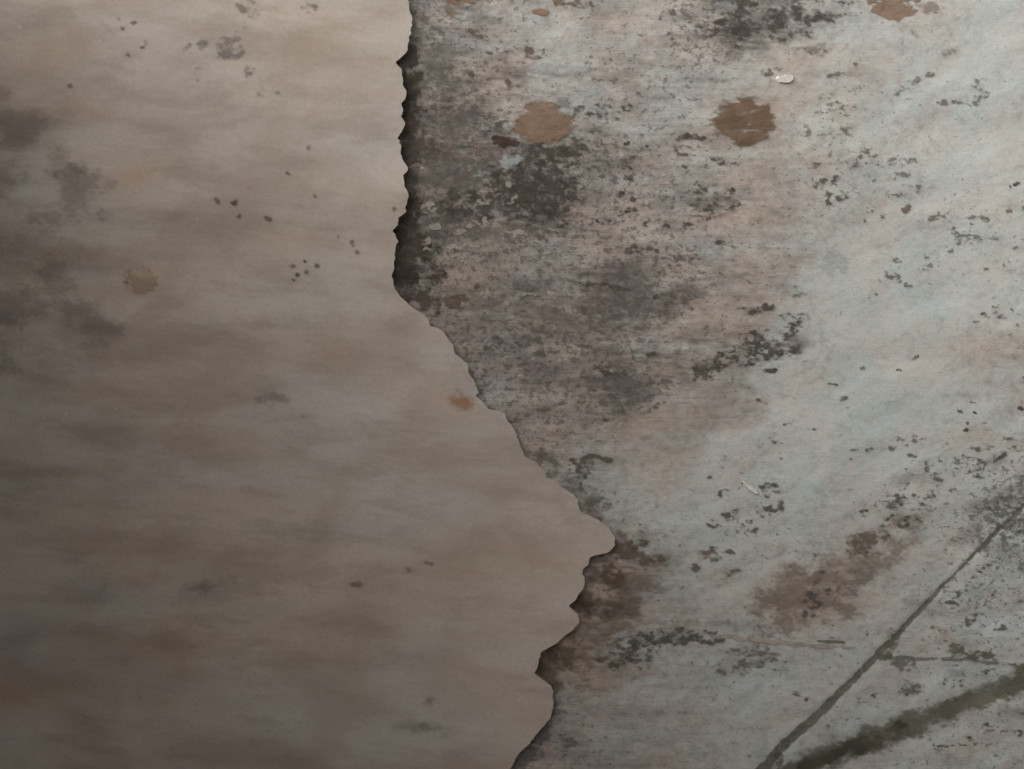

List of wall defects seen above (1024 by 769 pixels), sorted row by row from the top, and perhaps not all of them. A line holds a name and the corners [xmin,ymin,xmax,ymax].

rust [867,0,921,21]
leakage [392,45,603,315]
rust [492,101,574,148]
mould [573,104,632,120]
rust [710,97,775,146]
peeling [392,0,1024,769]
leakage [512,530,778,769]
mould [802,588,831,617]
crack [756,505,1024,769]
leakage [782,643,1024,769]